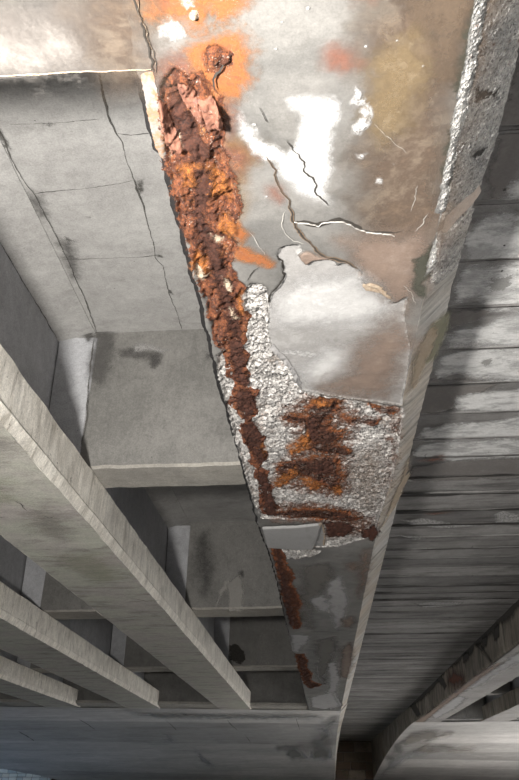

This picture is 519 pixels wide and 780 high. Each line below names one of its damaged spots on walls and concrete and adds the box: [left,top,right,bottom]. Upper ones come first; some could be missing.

rust [141,0,247,27]
crack [0,72,182,448]
rust [158,31,250,172]
crack [248,233,285,311]
damp [239,96,339,200]
crack [266,142,428,269]
spalling [425,0,519,285]
spalling [157,68,412,629]